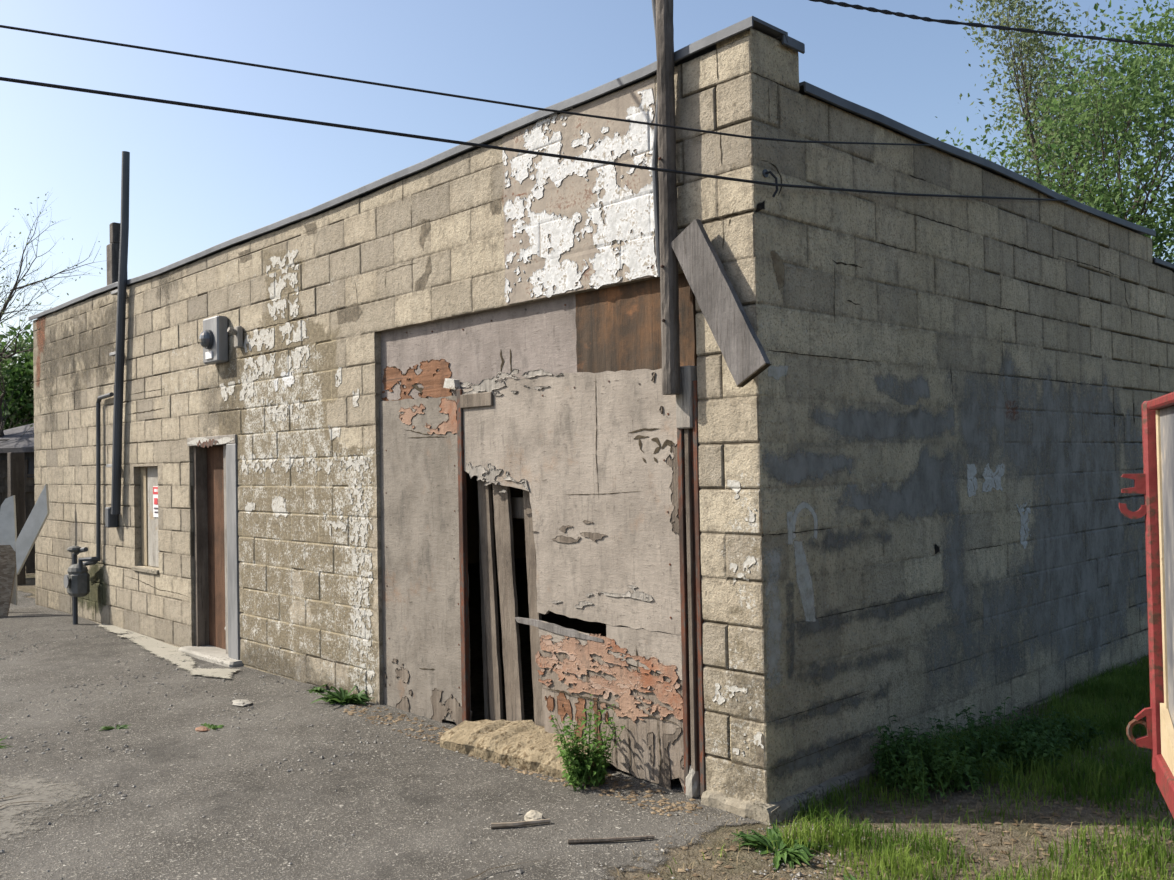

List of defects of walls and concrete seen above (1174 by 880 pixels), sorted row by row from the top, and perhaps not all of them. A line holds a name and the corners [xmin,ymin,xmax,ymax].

peeling [490,79,658,304]
peeling [220,249,310,421]
spalling [336,303,362,324]
peeling [240,425,375,693]
water stain [787,512,816,622]